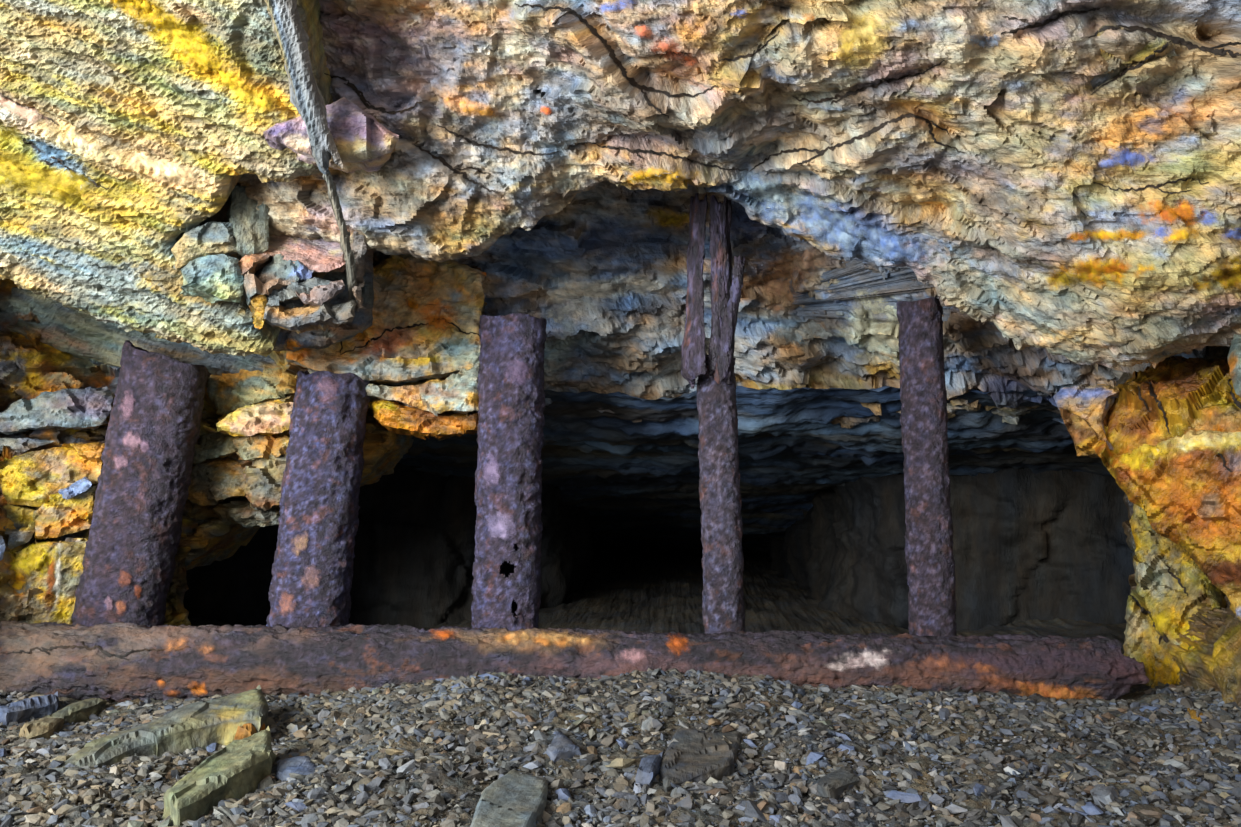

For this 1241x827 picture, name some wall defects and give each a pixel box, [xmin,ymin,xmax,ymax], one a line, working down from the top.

rust [121,391,134,418]
rust [114,433,148,468]
rust [484,456,499,482]
rust [489,513,515,538]
rust [295,536,308,554]
rust [302,567,319,588]
rust [106,572,141,614]
rust [280,595,293,612]
rust [166,638,186,651]
rust [502,632,589,646]
rust [622,650,643,662]
rust [926,656,1072,699]